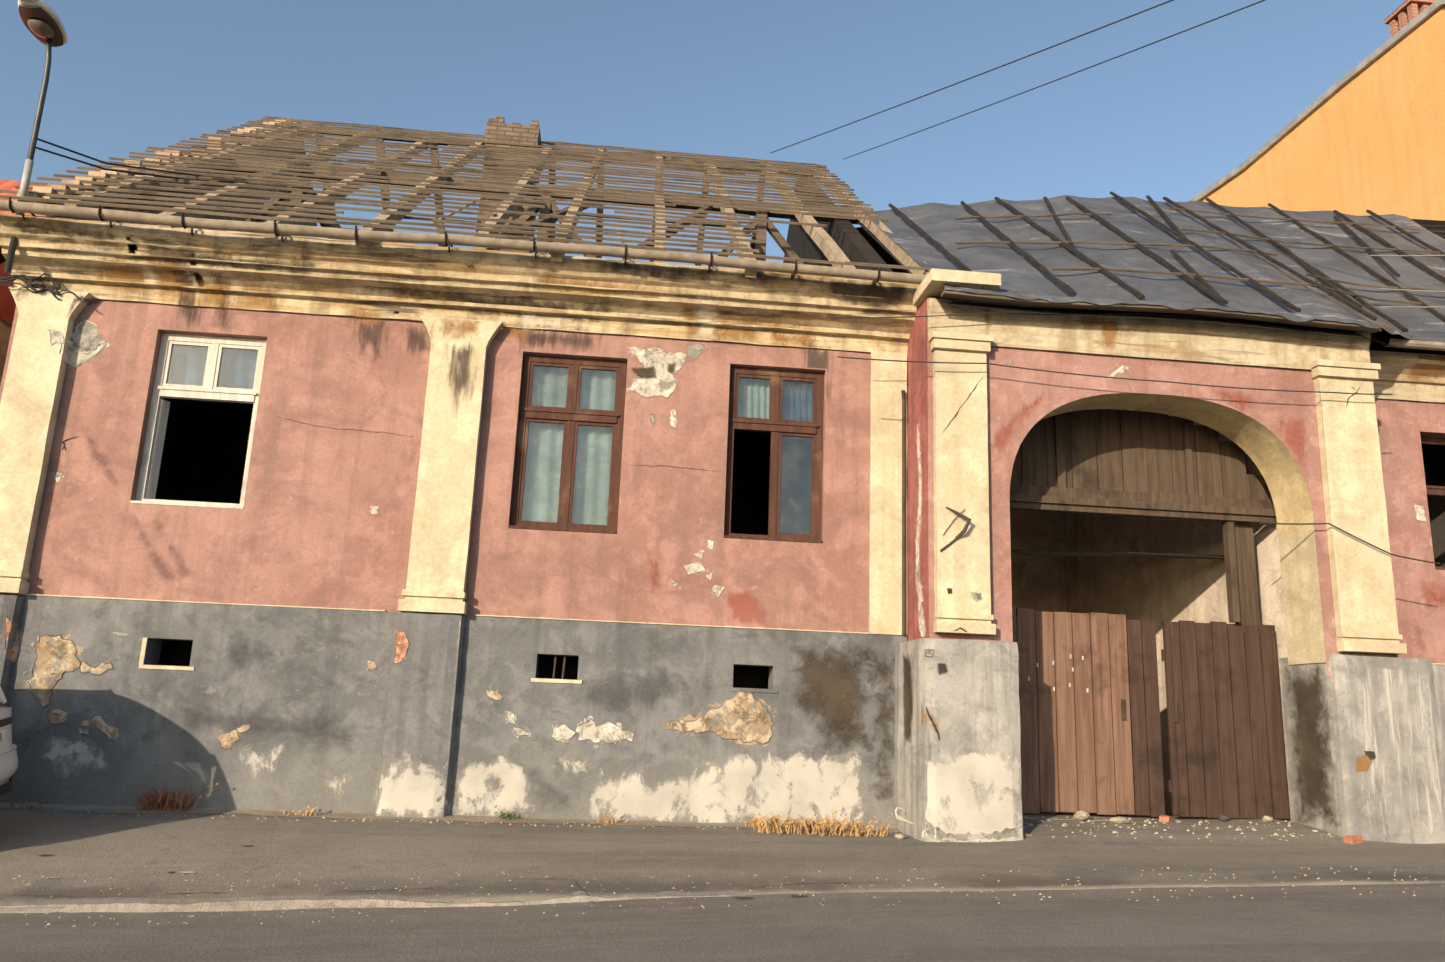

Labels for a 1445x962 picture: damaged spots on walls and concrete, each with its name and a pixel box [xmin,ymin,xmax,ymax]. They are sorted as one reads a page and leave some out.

flaking render [48,317,111,368]
water stain [148,242,312,326]
water stain [383,279,608,351]
water stain [603,262,718,337]
peeling [626,343,708,429]
flaking render [671,539,725,598]
flaking render [2,616,120,741]
water stain [44,734,108,777]
water stain [376,753,529,818]
flaking render [551,715,635,748]
flaking render [665,692,776,748]
water stain [560,650,922,824]